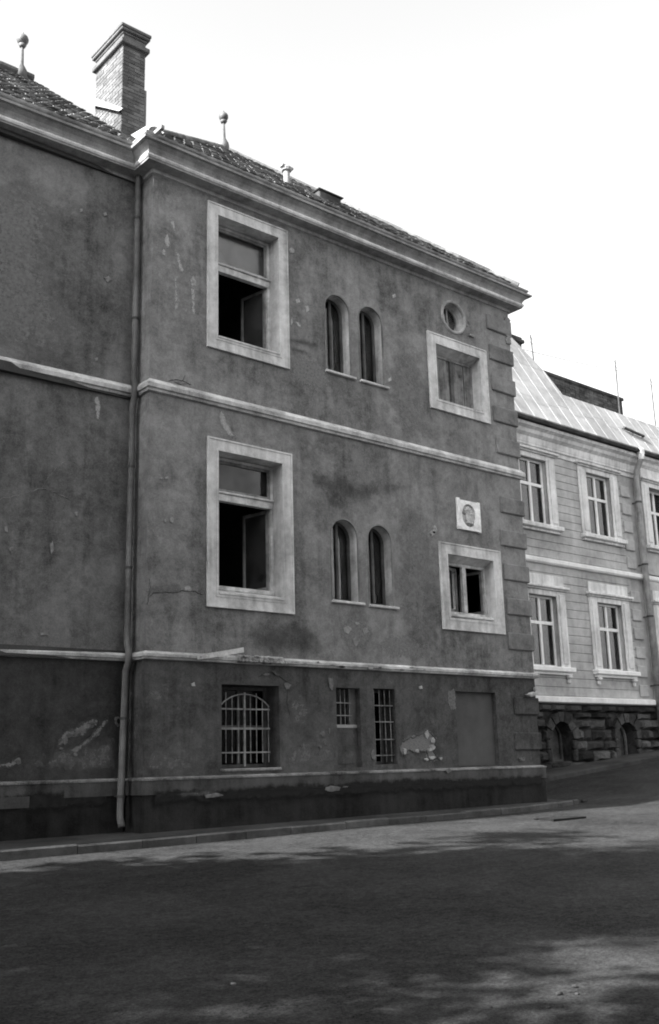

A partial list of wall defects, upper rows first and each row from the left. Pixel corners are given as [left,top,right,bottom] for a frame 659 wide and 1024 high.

crack [147,579,202,604]
spalling [236,654,299,666]
peeling [49,717,120,770]
spalling [398,728,451,773]